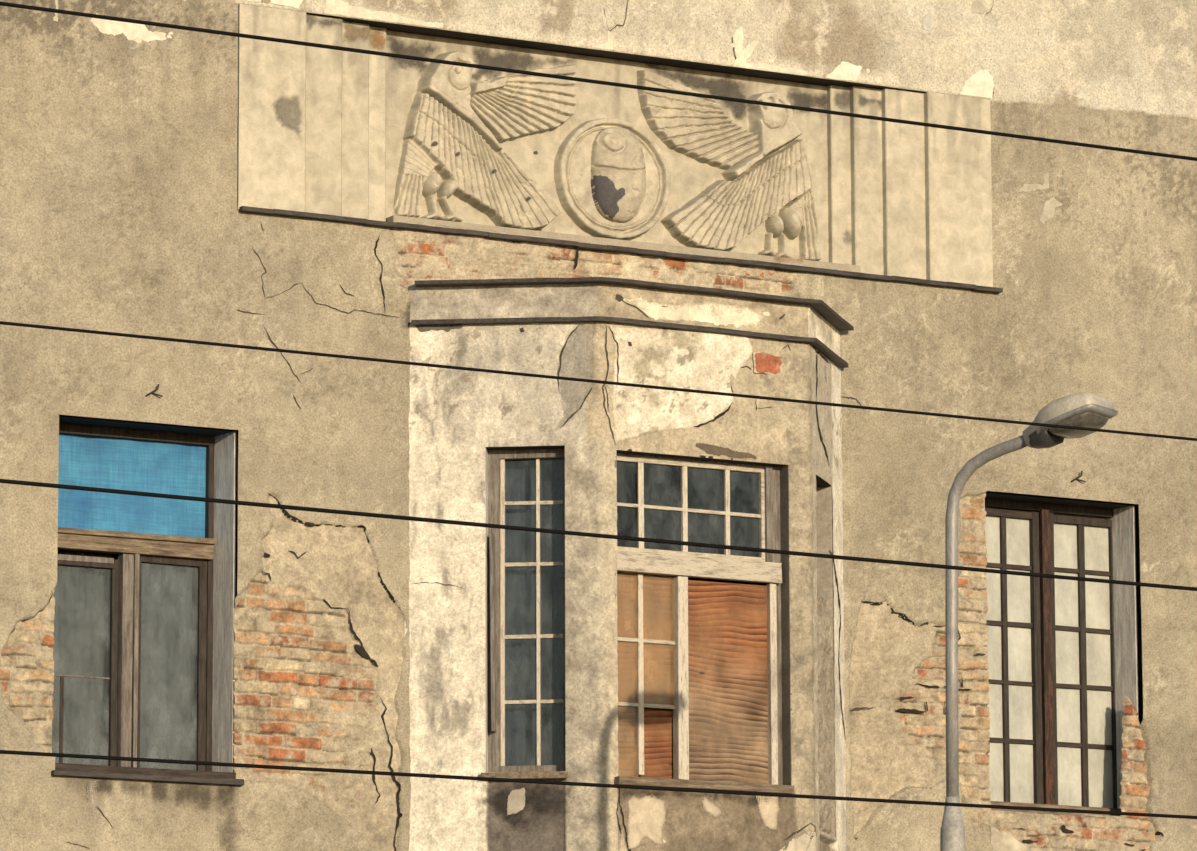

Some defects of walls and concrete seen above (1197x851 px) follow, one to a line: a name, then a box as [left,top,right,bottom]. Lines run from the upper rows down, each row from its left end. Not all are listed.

peeling [89,13,174,44]
peeling [320,0,444,28]
crack [237,223,399,409]
flaking render [374,222,796,307]
crack [557,301,668,444]
peeling [624,296,770,328]
flaking render [0,590,55,753]
flaking render [233,494,404,851]
crack [832,548,876,741]
flaking render [848,493,1164,851]
peeling [627,795,666,849]
peeling [756,796,780,830]